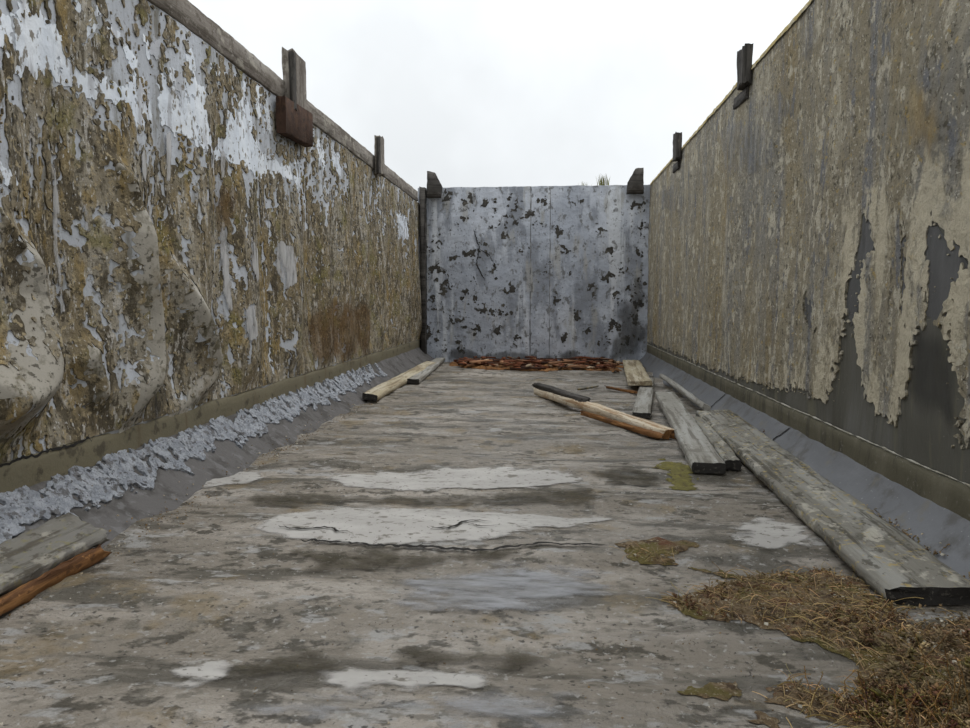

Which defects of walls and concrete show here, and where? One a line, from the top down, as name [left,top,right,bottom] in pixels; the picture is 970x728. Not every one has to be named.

peeling [0,0,302,192]
peeling [316,139,341,176]
spalling [427,242,522,354]
spalling [427,188,571,254]
spalling [587,201,648,348]
spalling [846,215,874,326]
spalling [926,225,968,321]